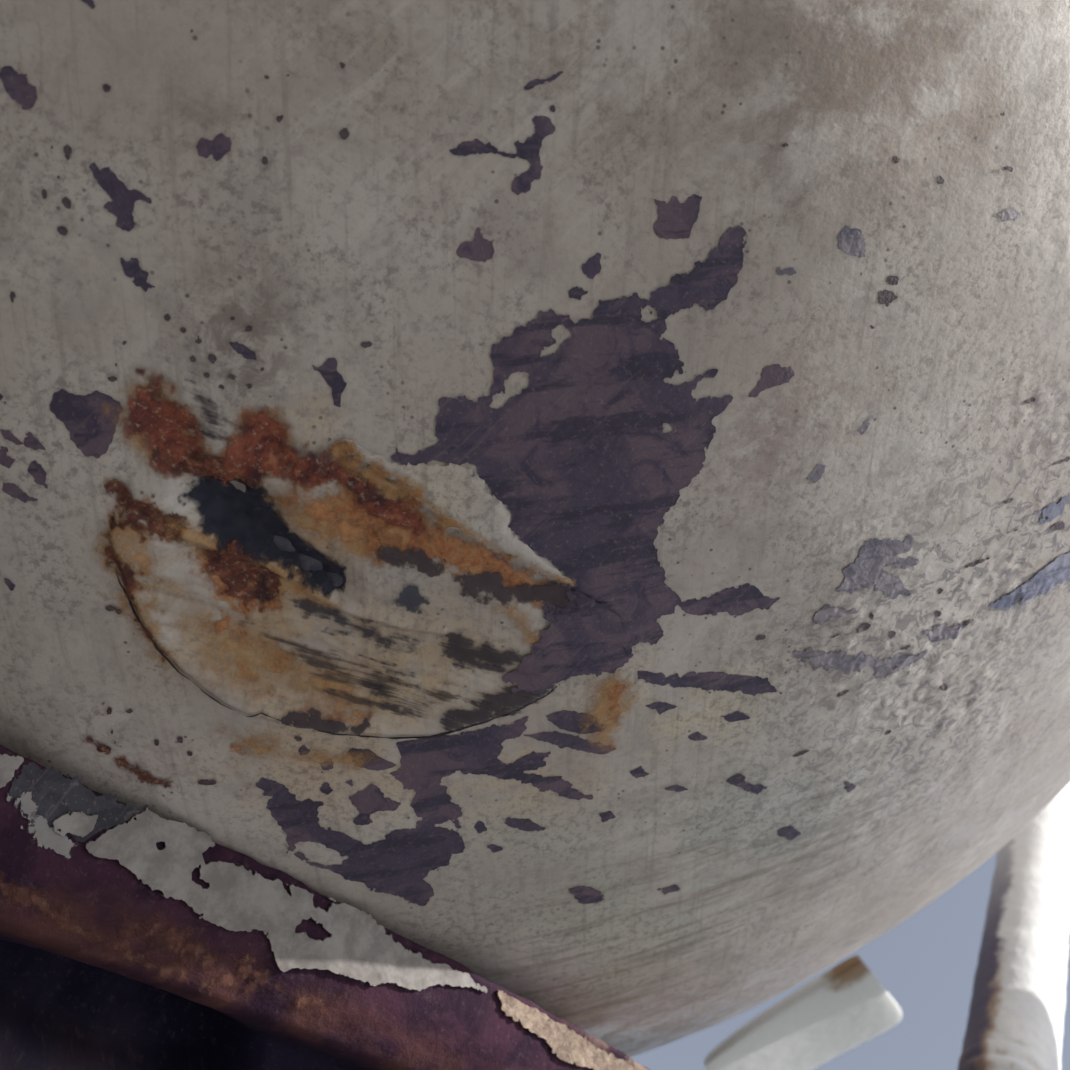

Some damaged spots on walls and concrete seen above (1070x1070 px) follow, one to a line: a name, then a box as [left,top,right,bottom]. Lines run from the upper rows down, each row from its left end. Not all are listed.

peeling [450,105,556,195]
peeling [89,163,152,232]
spalling [0,429,48,489]
peeling [49,388,123,459]
rust [118,369,547,588]
peeling [343,226,782,696]
rust [99,479,372,724]
rust [587,677,633,748]
peeling [0,753,24,788]
rust [83,737,172,788]
peeling [256,710,616,906]
rust [112,921,278,995]